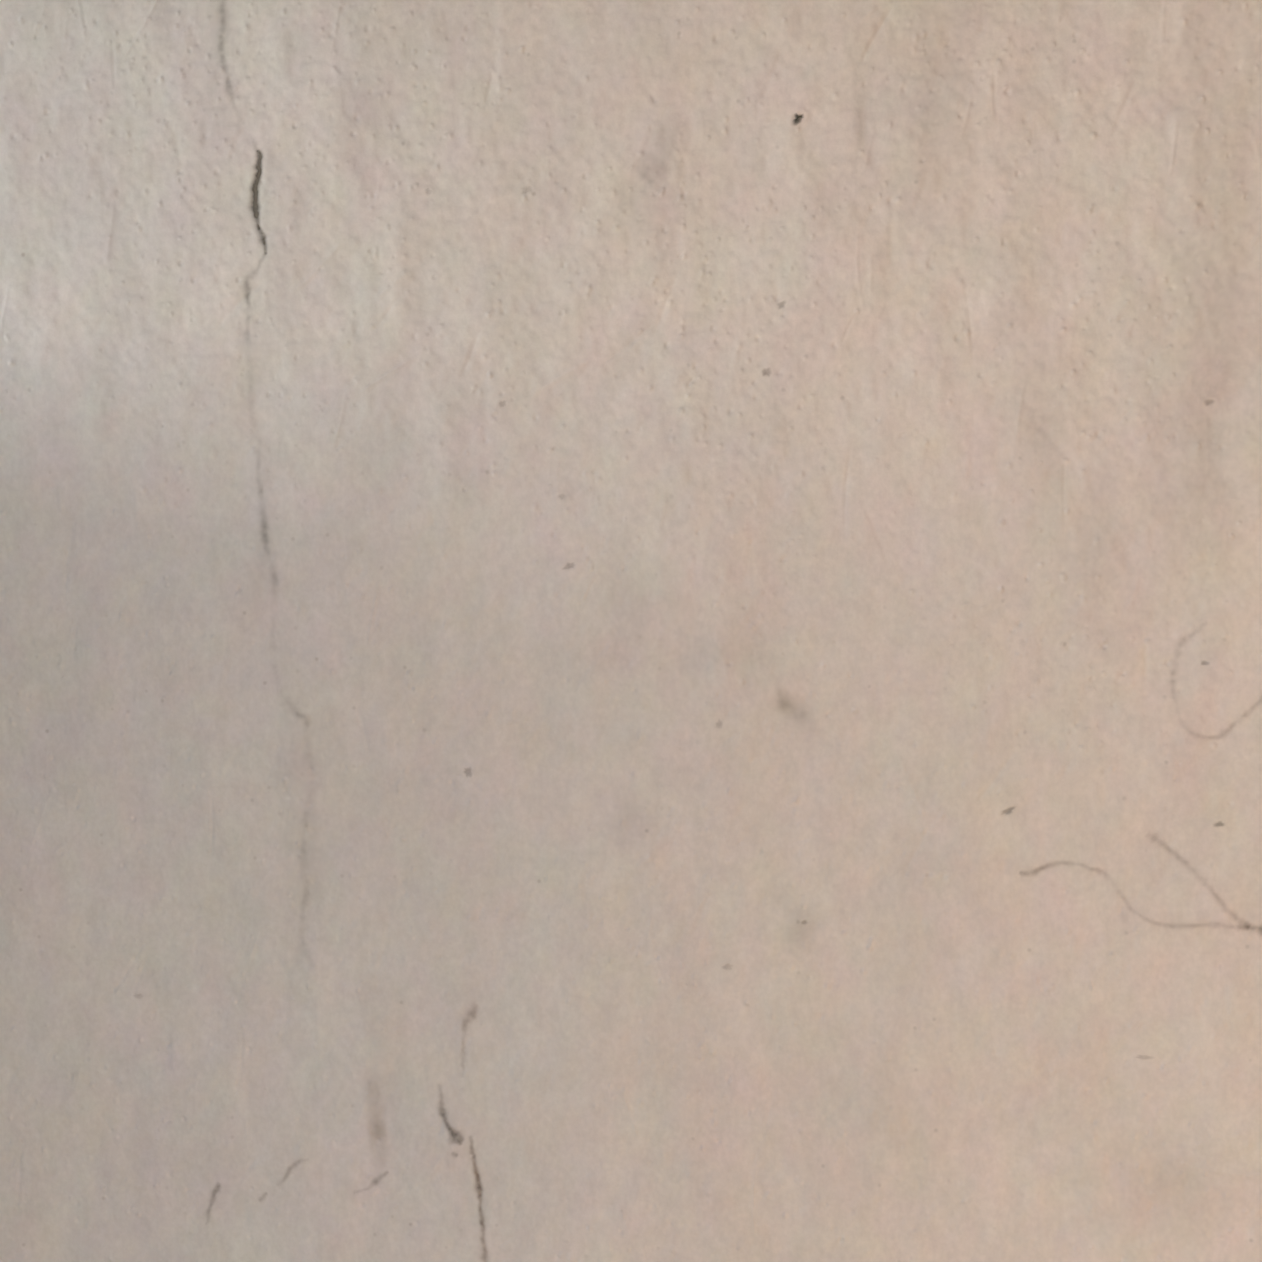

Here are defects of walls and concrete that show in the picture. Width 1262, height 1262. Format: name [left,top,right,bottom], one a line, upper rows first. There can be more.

crack [252,151,266,246]